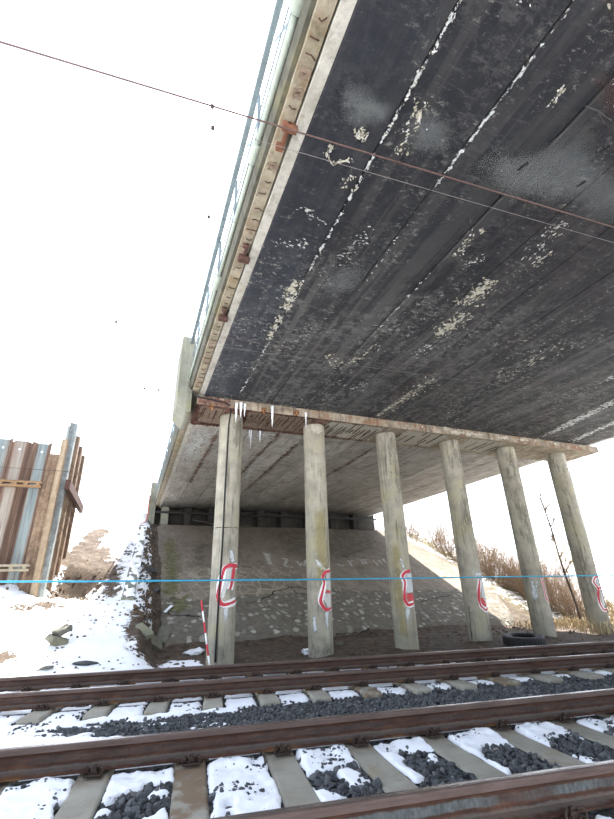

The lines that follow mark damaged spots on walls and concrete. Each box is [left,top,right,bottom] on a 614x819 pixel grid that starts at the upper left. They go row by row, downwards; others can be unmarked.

damp [380,0,462,144]
damp [435,56,535,187]
peeling [266,279,303,340]
peeling [432,277,498,338]
damp [537,399,614,439]